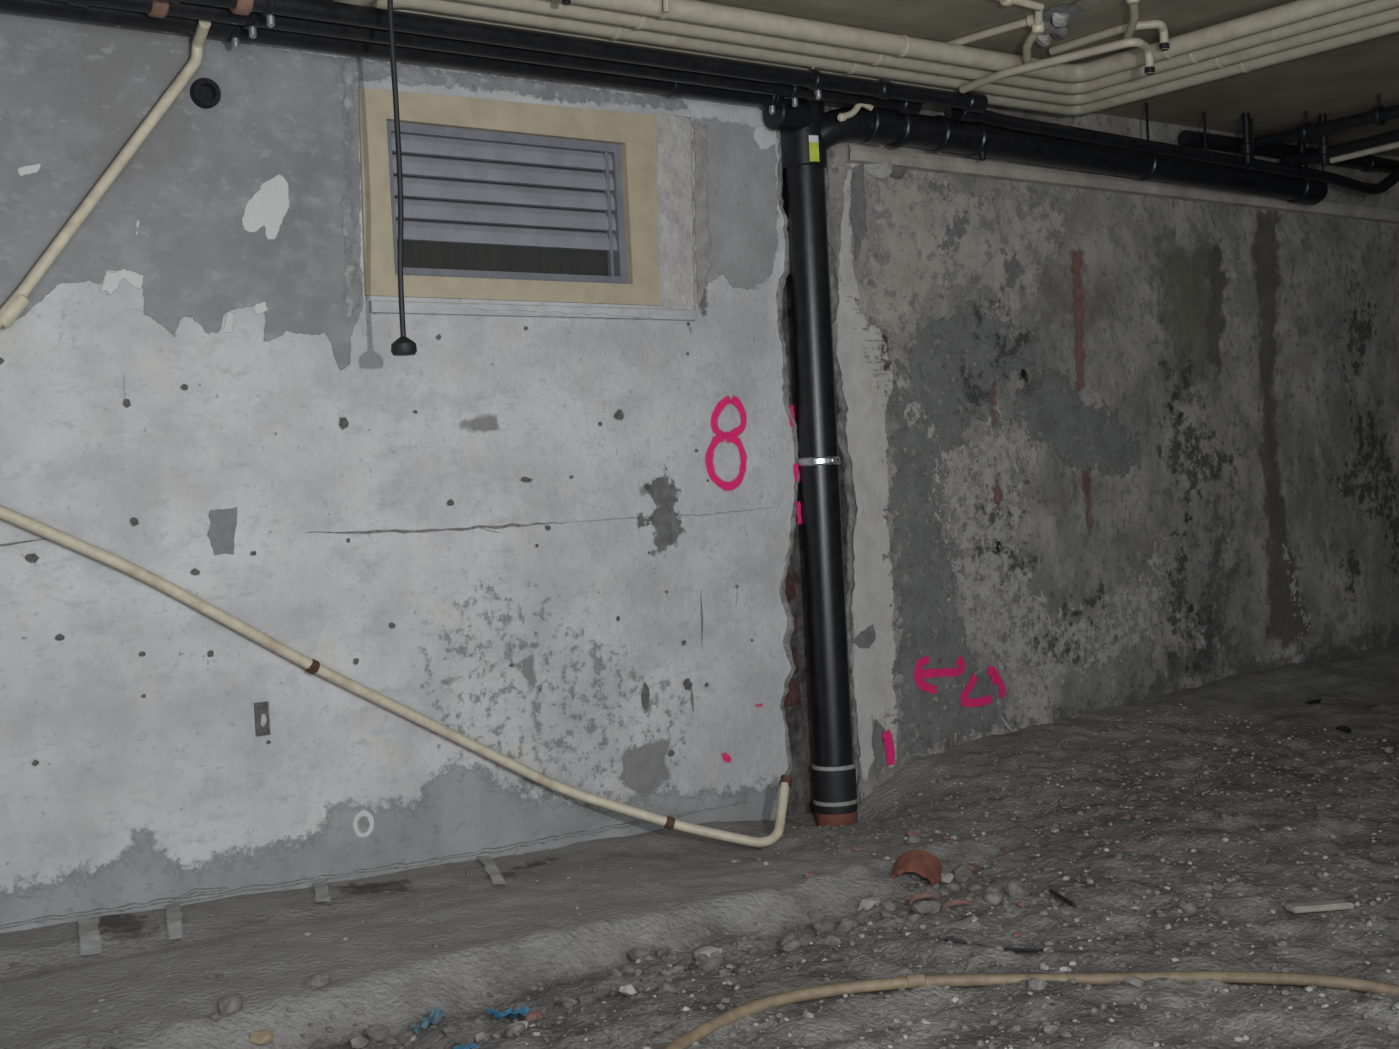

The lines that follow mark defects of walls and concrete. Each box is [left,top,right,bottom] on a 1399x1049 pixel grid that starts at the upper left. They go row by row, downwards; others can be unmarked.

peeling [850,164,867,259]
flaking render [828,241,840,324]
rust [1071,251,1085,391]
peeling [0,11,801,939]
crack [306,507,773,534]
peeling [833,300,1182,806]
rust [1081,469,1093,531]
leakage [1115,210,1399,705]
leakage [478,856,506,885]
leakage [166,903,183,940]